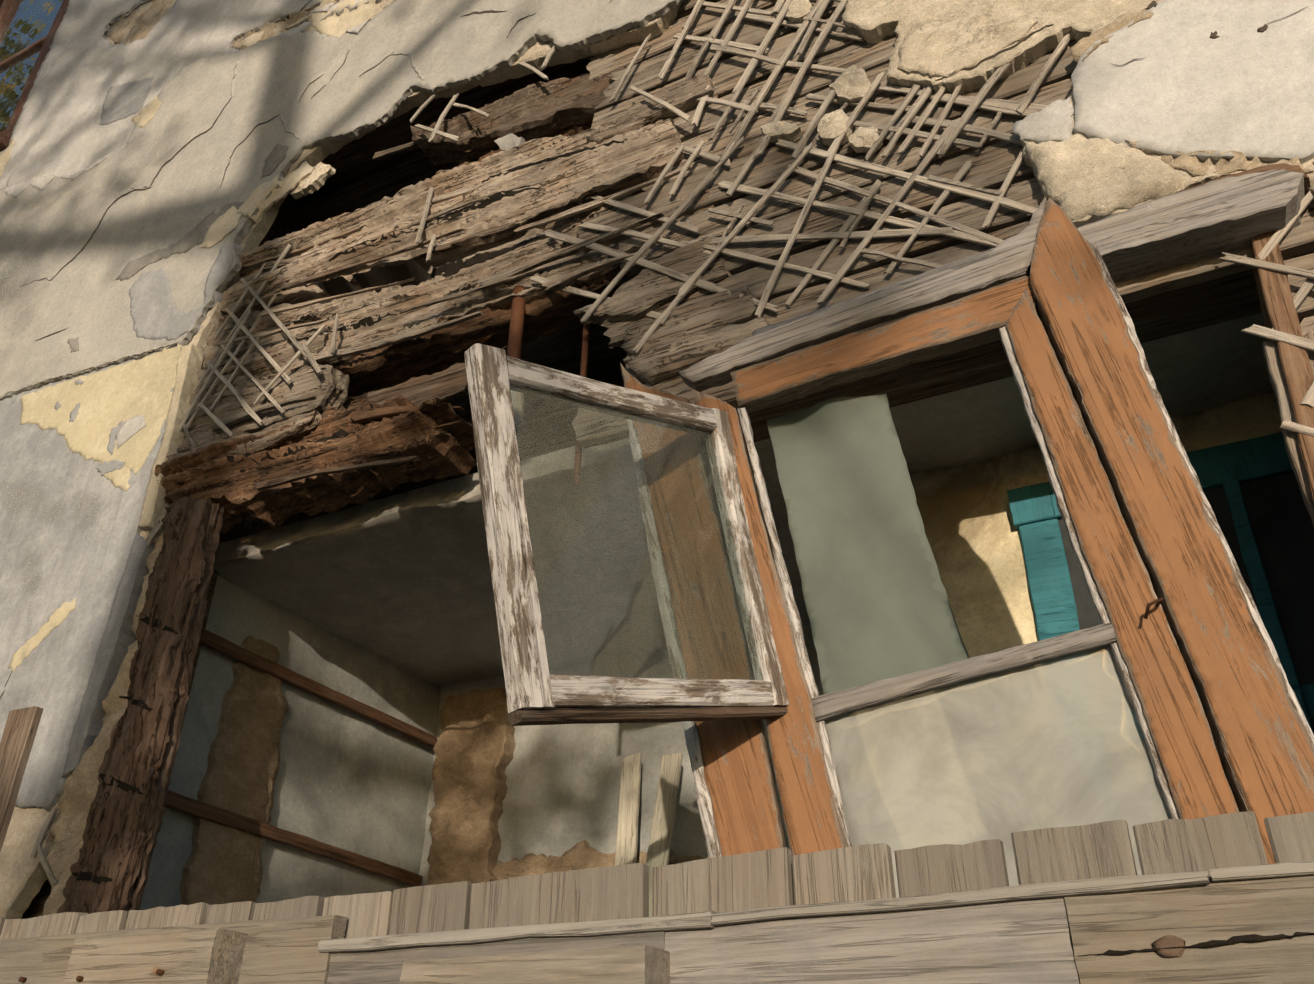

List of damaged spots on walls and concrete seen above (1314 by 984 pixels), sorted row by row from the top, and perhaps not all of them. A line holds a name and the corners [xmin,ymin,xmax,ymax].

spalling [107,0,174,45]
peeling [232,0,395,50]
crack [461,9,536,37]
crack [21,0,424,286]
peeling [1013,96,1075,143]
crack [283,138,627,340]
crack [35,327,67,341]
peeling [20,143,315,491]
peeling [8,598,77,672]